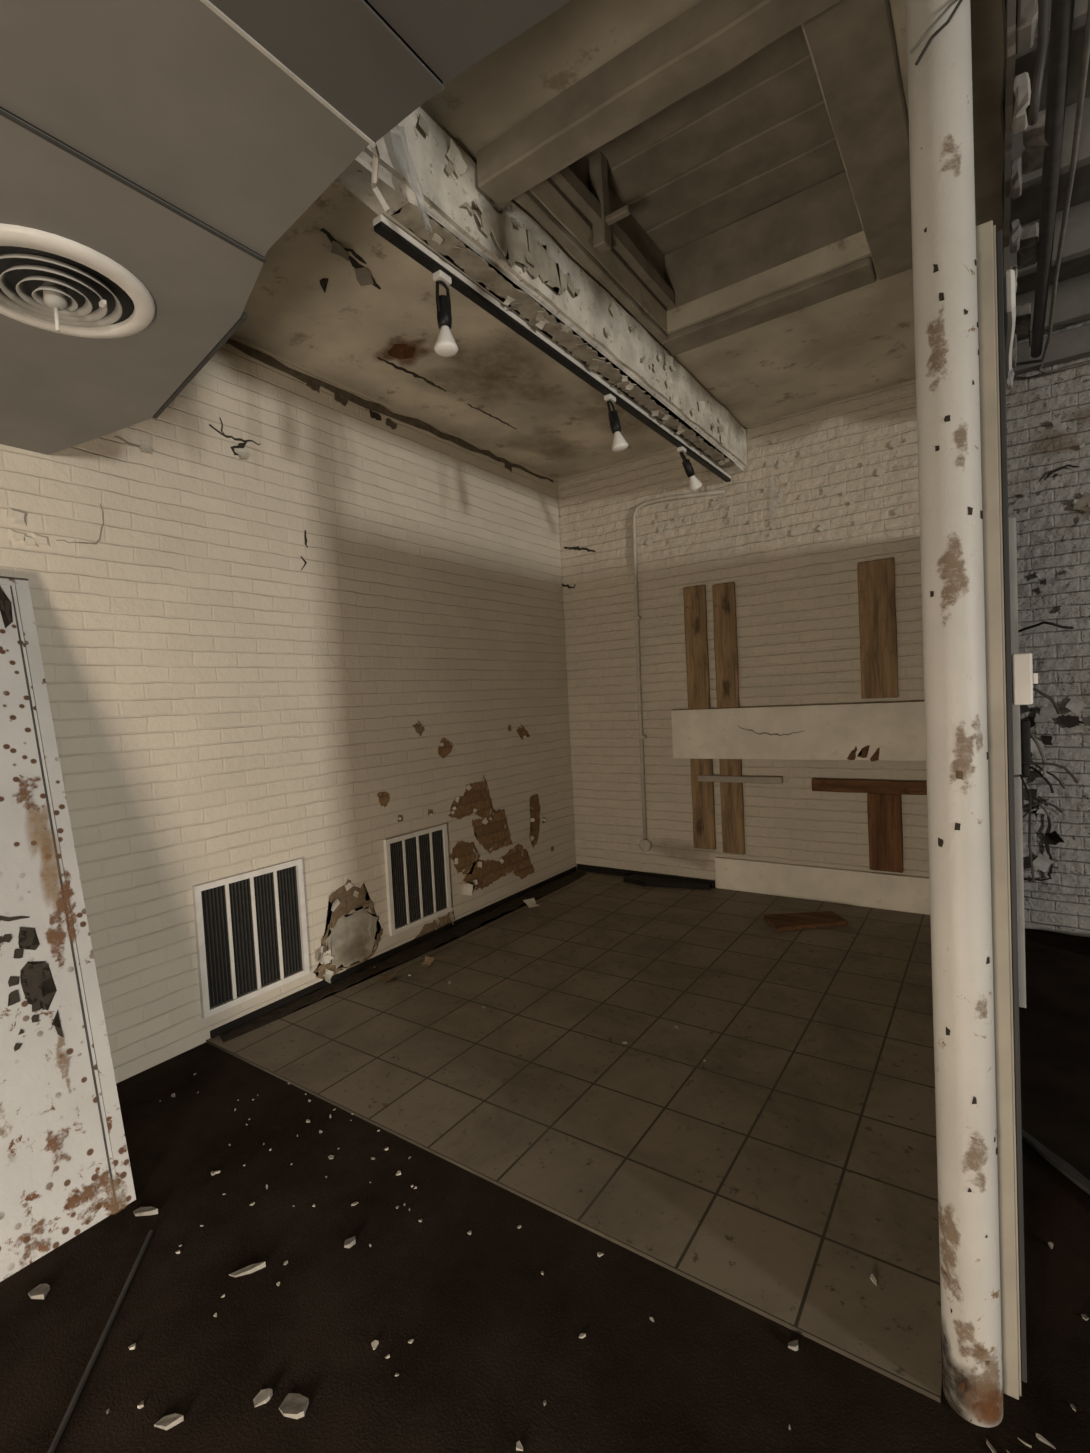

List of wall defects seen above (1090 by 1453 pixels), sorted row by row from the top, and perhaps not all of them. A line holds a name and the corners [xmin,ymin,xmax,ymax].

peeling [445,138,467,178]
spalling [382,341,427,364]
peeling [391,198,736,468]
rust [938,537,967,608]
rust [951,724,983,780]
flaking render [1020,696,1090,882]
rust [13,775,79,967]
peeling [428,775,554,896]
rust [44,1129,71,1172]
rust [66,1171,128,1225]
rust [9,1220,51,1265]
rust [941,1322,1004,1422]